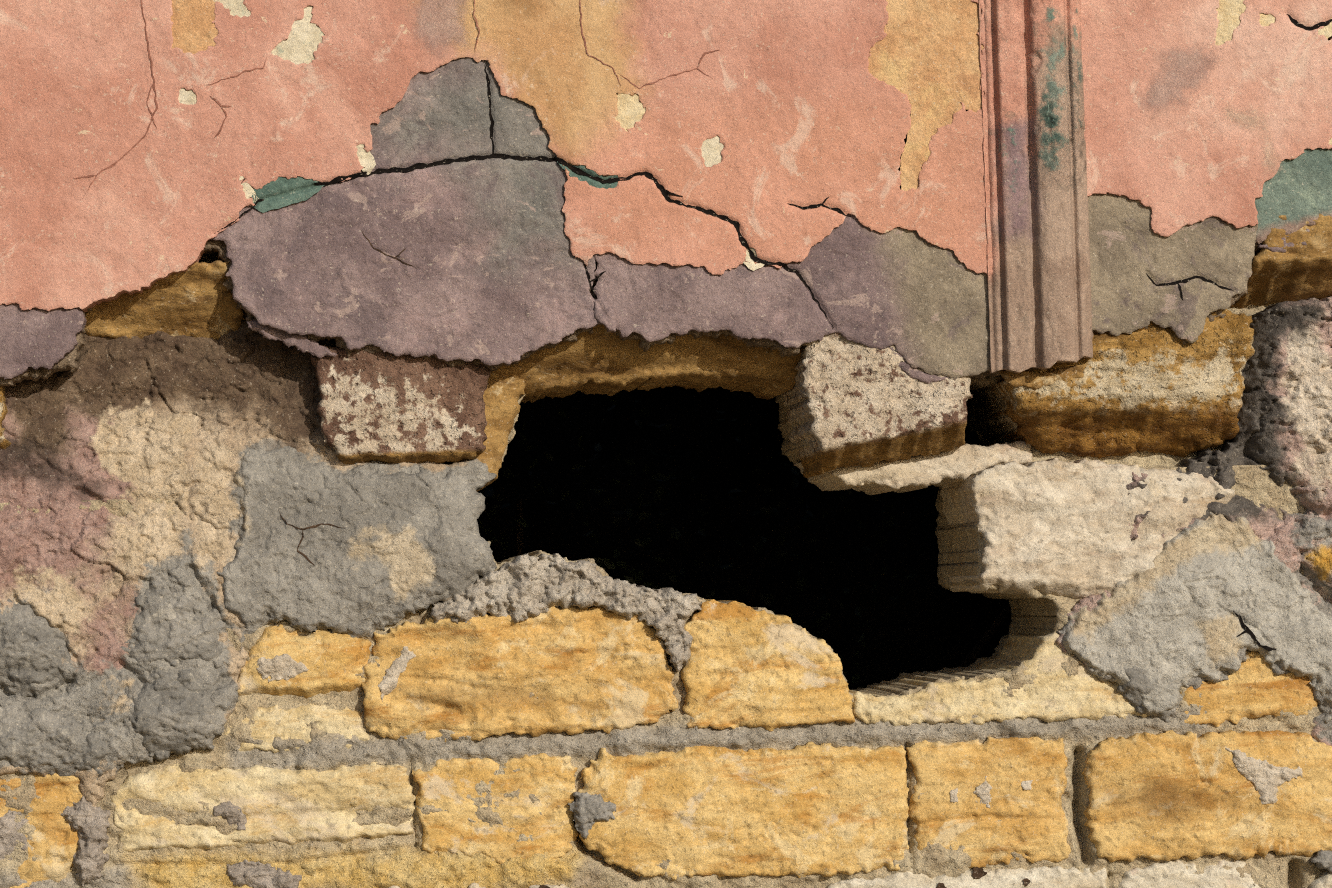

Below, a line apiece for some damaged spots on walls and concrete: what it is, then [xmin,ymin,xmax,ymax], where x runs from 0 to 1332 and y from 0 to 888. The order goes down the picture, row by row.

peeling [170,0,251,54]
peeling [271,6,325,65]
peeling [1147,0,1275,107]
crack [1287,14,1332,30]
peeling [868,0,985,191]
crack [313,0,834,328]
crack [214,199,264,234]
crack [788,197,851,217]
spalling [0,57,1087,807]